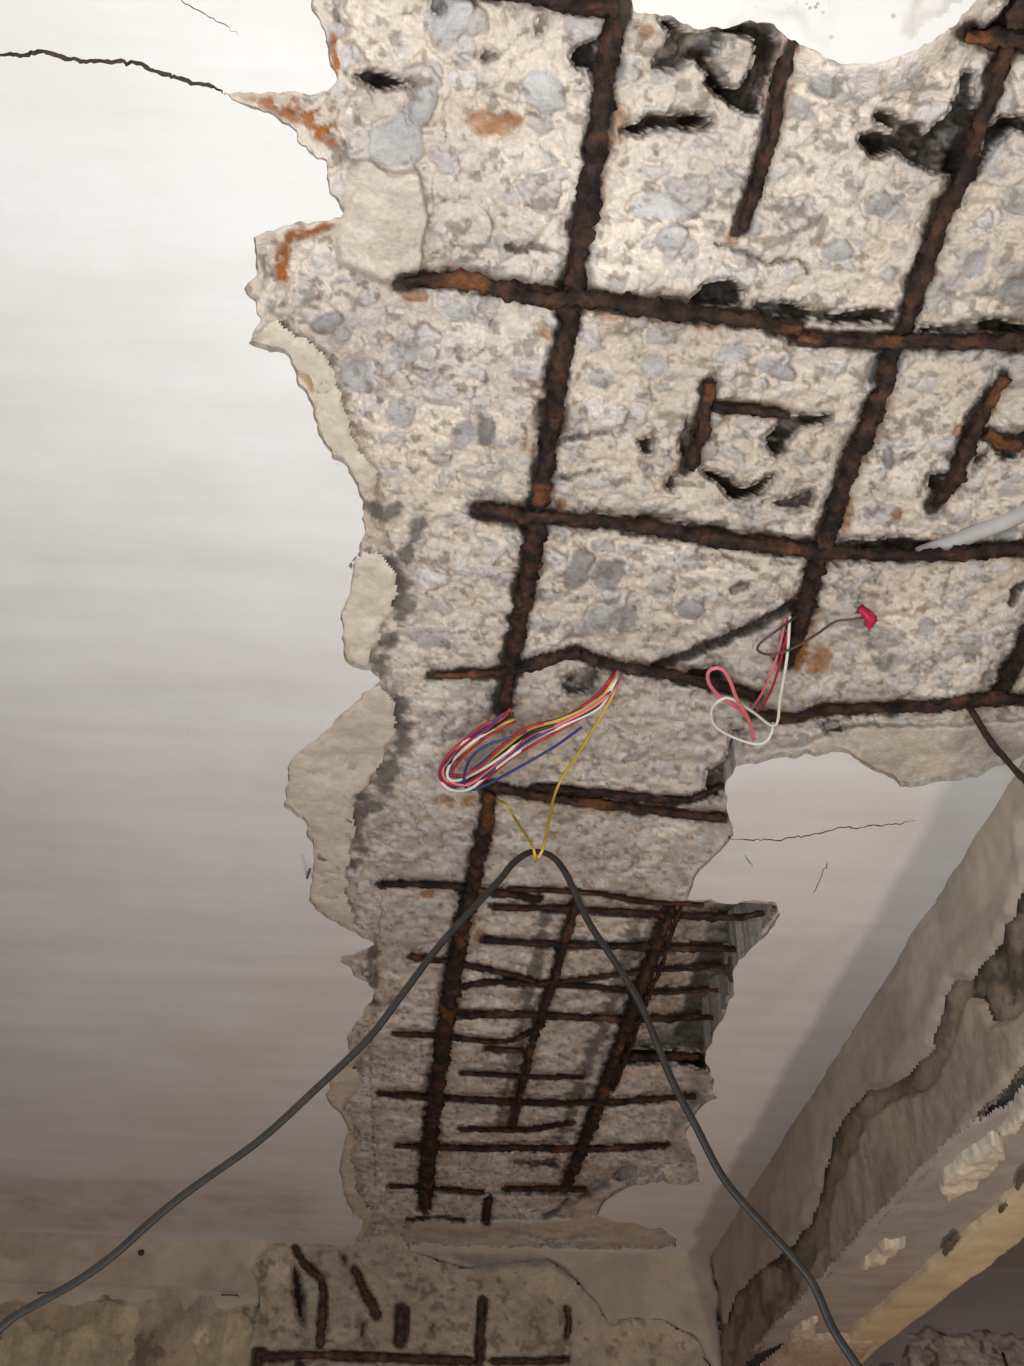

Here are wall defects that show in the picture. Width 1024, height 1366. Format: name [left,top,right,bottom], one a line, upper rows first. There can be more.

crack [181,0,238,35]
crack [0,49,223,93]
rust [331,34,339,74]
rust [260,98,336,145]
spalling [222,0,1024,1114]
flaking render [711,759,1024,1353]
spalling [191,854,709,1366]
flaking render [0,1301,149,1366]
spalling [879,1326,1024,1366]